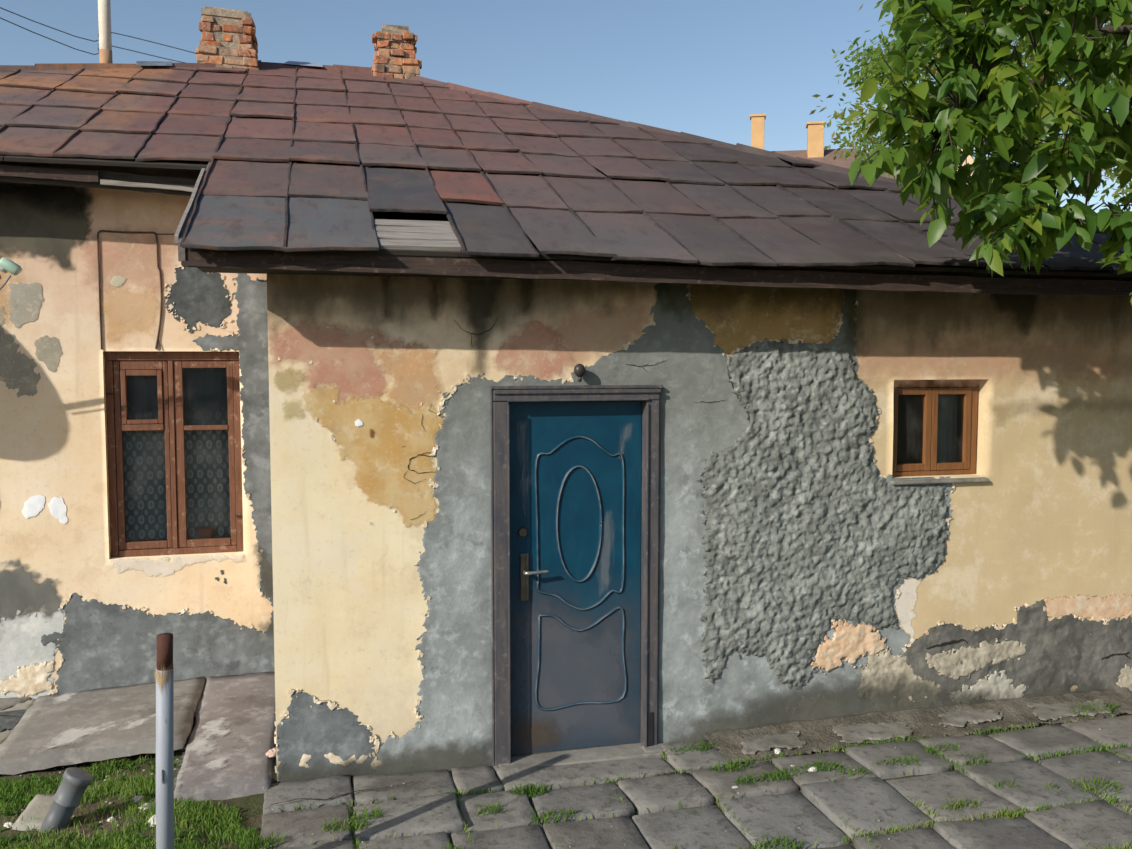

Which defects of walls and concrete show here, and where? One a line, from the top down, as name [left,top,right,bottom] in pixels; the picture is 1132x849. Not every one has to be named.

damp [0,182,91,269]
damp [466,280,546,369]
crack [403,403,436,484]
flaking render [0,265,1132,783]